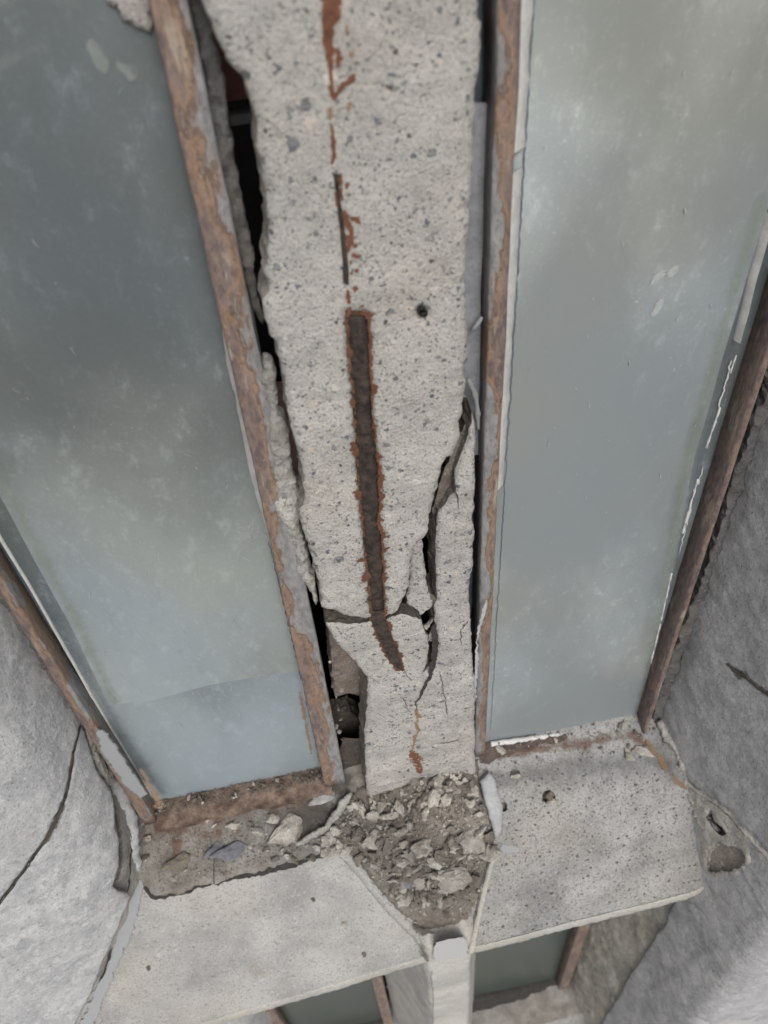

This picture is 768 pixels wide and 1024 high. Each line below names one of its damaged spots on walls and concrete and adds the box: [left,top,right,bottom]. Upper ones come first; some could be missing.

rust [321,0,405,671]
crack [0,725,81,904]
spalling [319,760,507,962]
rust [407,709,423,774]
crack [402,622,468,713]
rust [563,733,688,789]